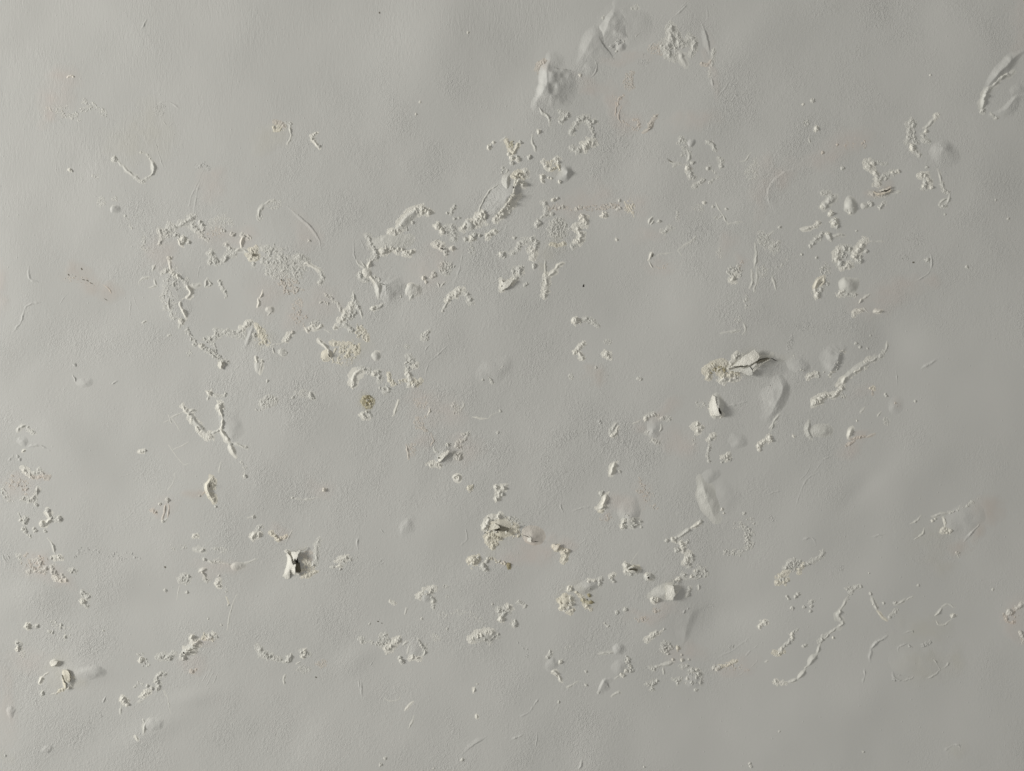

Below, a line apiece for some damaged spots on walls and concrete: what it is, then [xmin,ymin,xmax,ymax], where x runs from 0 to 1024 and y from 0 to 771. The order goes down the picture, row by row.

peeling [498,263,526,293]
peeling [303,319,332,362]
peeling [709,395,721,416]
peeling [480,511,525,550]
peeling [282,536,357,579]